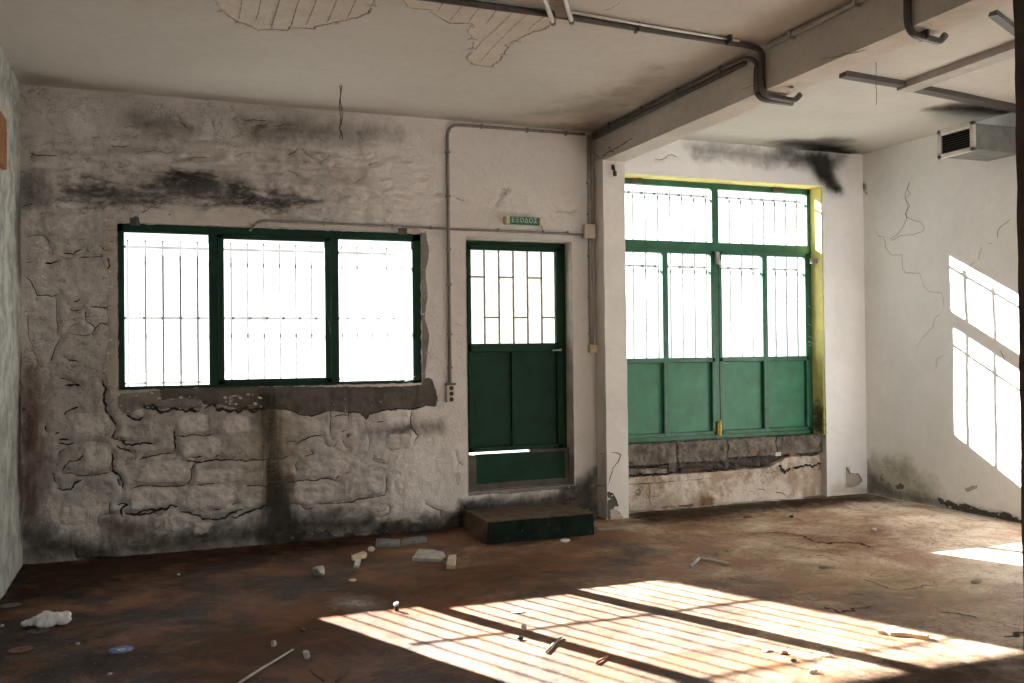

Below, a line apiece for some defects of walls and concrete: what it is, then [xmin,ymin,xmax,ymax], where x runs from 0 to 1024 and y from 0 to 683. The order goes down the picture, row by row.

flaking render [216,0,377,32]
flaking render [404,0,556,67]
peeling [98,229,439,421]
crack [875,229,944,369]
crack [18,235,391,534]
leakage [1,352,598,605]
spalling [629,461,680,497]
flaking render [700,454,822,474]
flaking render [845,466,863,488]
crack [749,532,871,548]